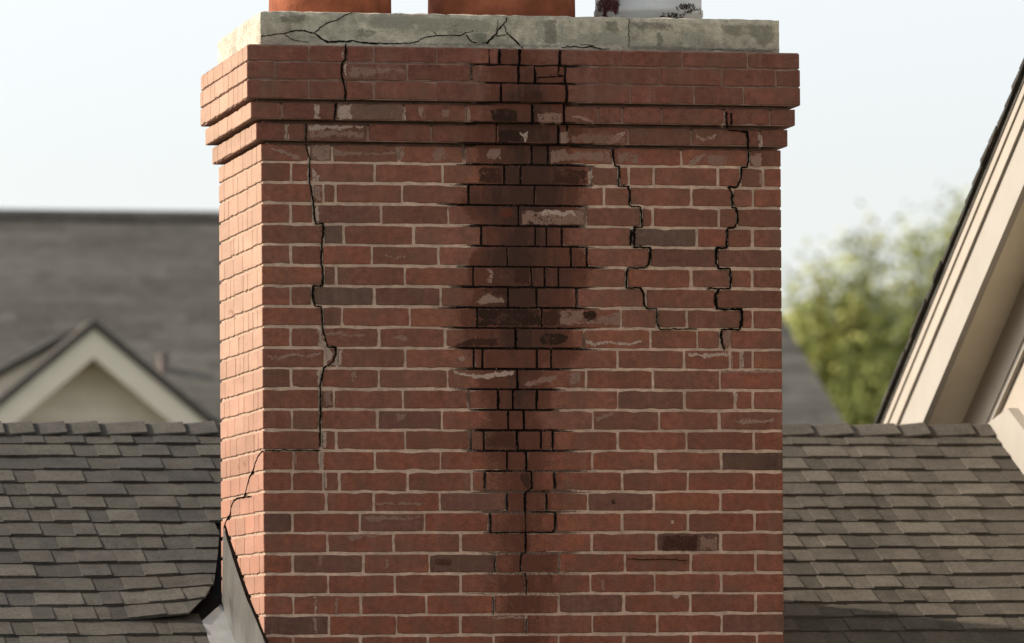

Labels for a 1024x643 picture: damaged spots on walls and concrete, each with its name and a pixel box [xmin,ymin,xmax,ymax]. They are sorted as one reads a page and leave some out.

crack [261,11,630,146]
crack [224,123,337,528]
leakage [399,14,642,620]
crack [612,111,750,350]
crack [484,330,556,594]